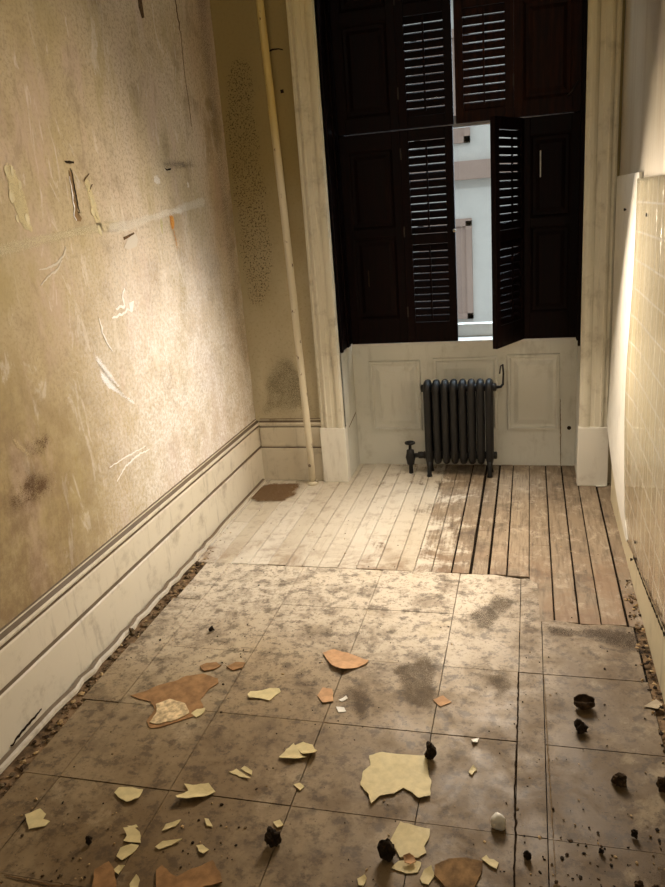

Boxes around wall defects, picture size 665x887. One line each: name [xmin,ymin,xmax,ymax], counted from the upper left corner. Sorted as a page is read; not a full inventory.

water stain [8,467,54,511]